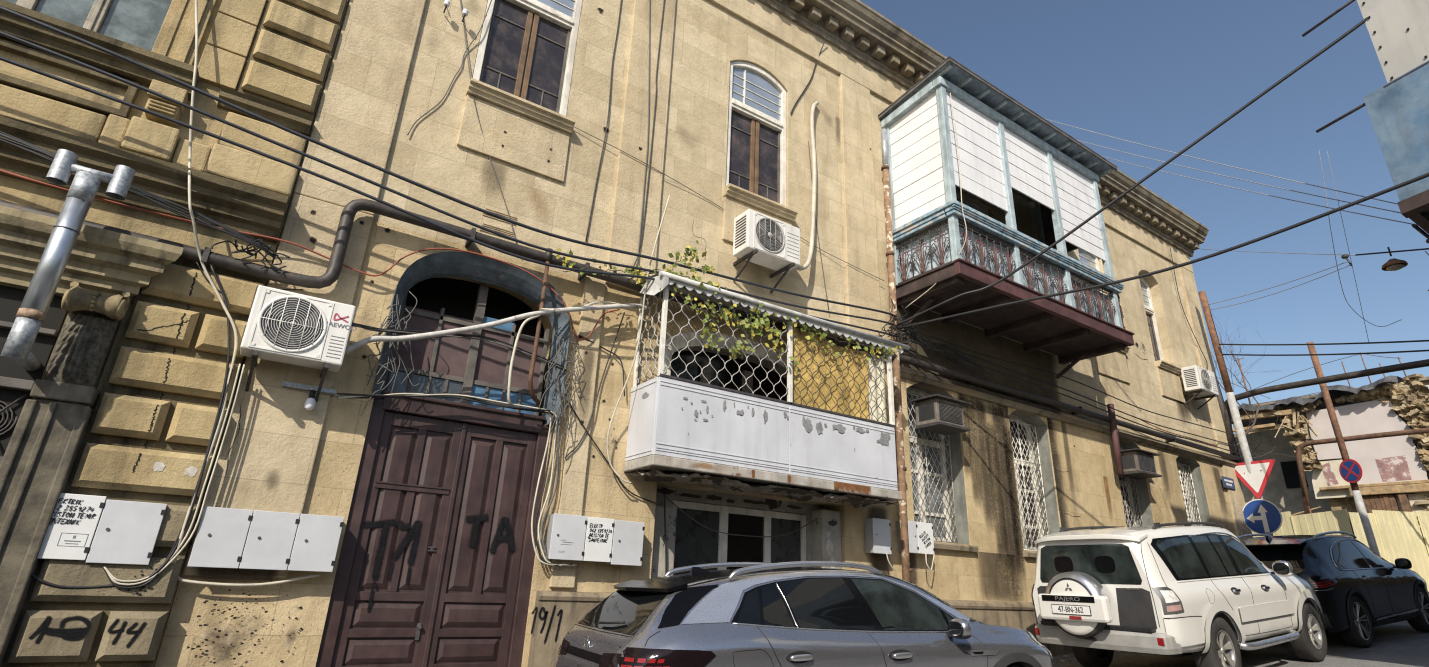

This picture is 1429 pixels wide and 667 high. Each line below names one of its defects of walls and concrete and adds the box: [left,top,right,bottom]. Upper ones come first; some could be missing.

crack [133,272,197,472]
peeling [681,397,890,451]
damp [960,396,1024,597]